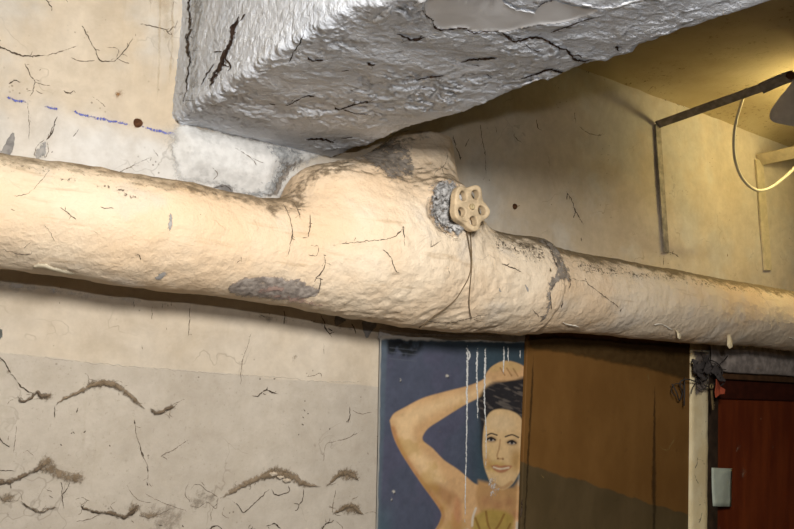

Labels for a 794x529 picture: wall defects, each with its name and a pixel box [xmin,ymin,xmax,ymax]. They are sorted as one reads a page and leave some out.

crack [0,0,245,153]
crack [397,0,594,80]
spalling [424,0,643,33]
leakage [355,138,414,178]
crack [130,421,227,529]